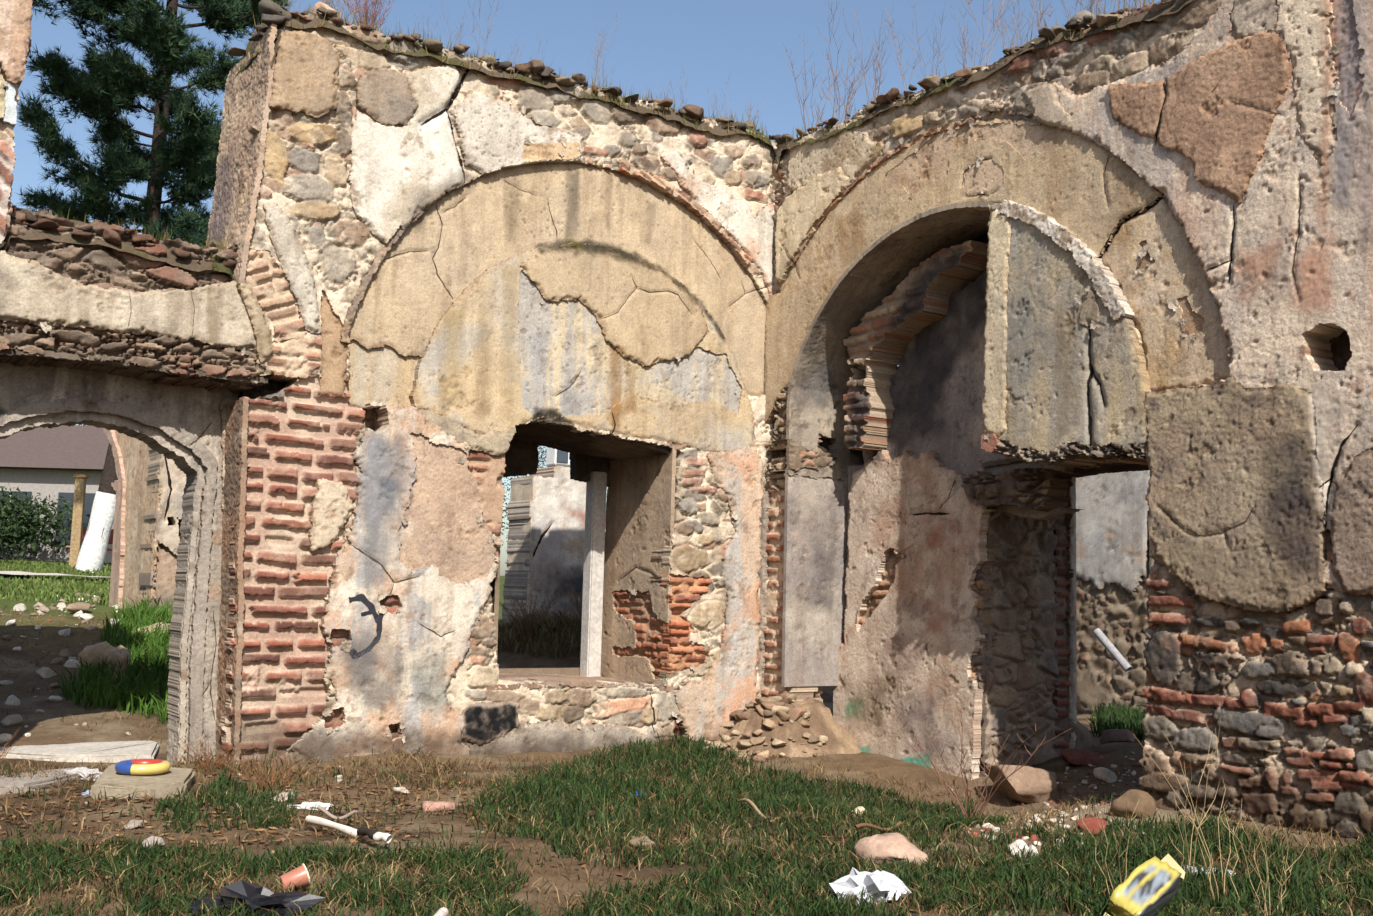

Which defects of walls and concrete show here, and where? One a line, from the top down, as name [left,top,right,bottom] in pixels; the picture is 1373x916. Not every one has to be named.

spalling [846,0,1223,198]
damp [1337,0,1354,205]
spalling [248,19,794,327]
crack [600,278,692,319]
crack [695,241,800,305]
spalling [362,408,378,430]
crack [1087,324,1105,446]
crack [1319,424,1358,548]
spalling [453,448,738,738]
spalling [857,549,906,624]
spalling [321,707,344,734]
spalling [1138,566,1373,842]